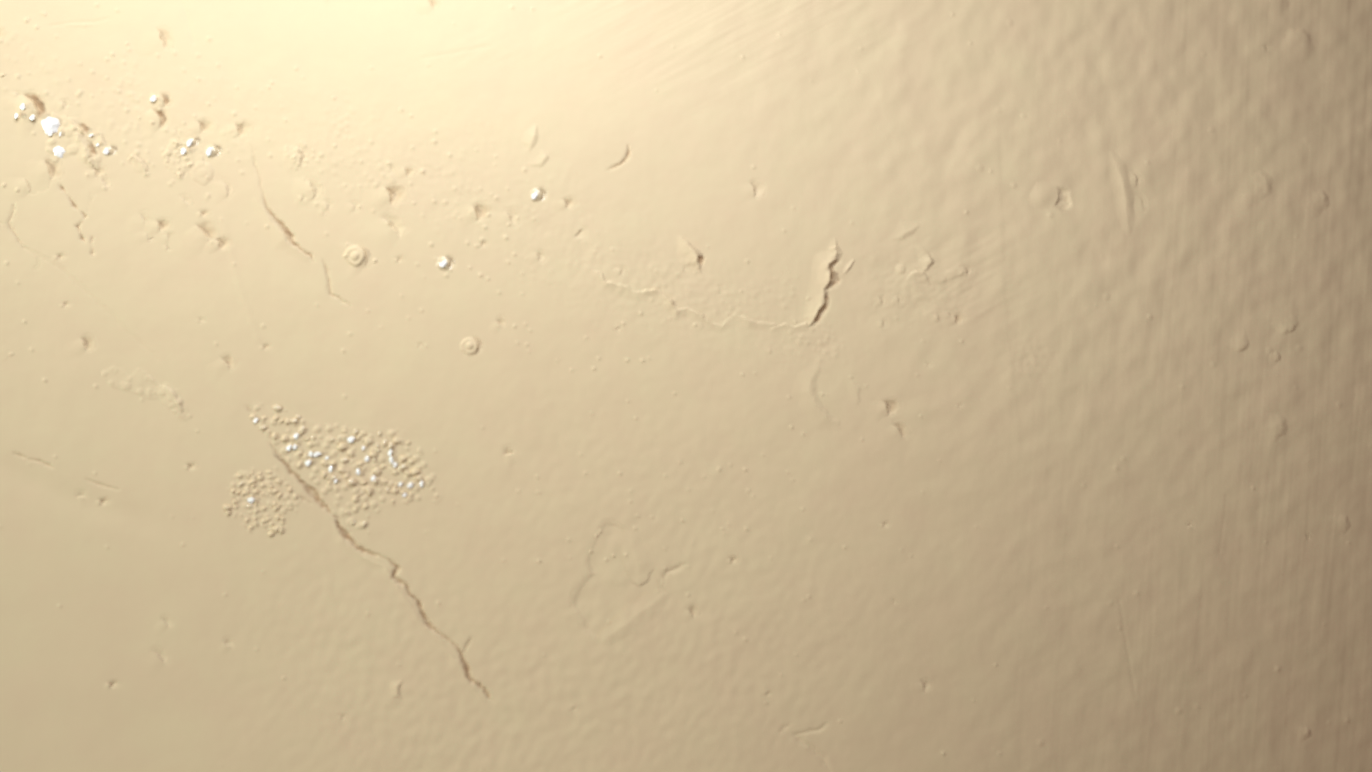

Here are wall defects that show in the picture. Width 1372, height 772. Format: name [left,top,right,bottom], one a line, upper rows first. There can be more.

crack [251,146,352,308]
crack [270,444,494,703]